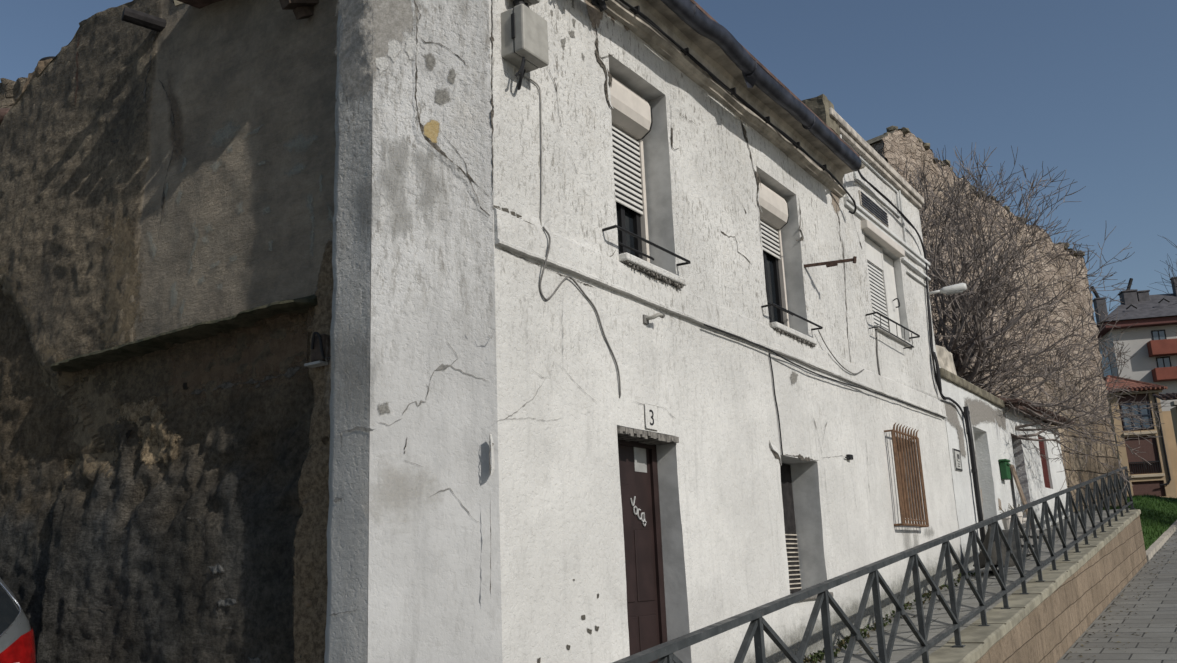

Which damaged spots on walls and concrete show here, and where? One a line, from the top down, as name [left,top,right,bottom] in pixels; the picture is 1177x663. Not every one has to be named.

peeling [335,0,437,99]
flaking render [435,68,455,105]
crack [411,0,616,257]
crack [500,248,593,332]
flaking render [60,369,180,491]
crack [340,341,487,467]